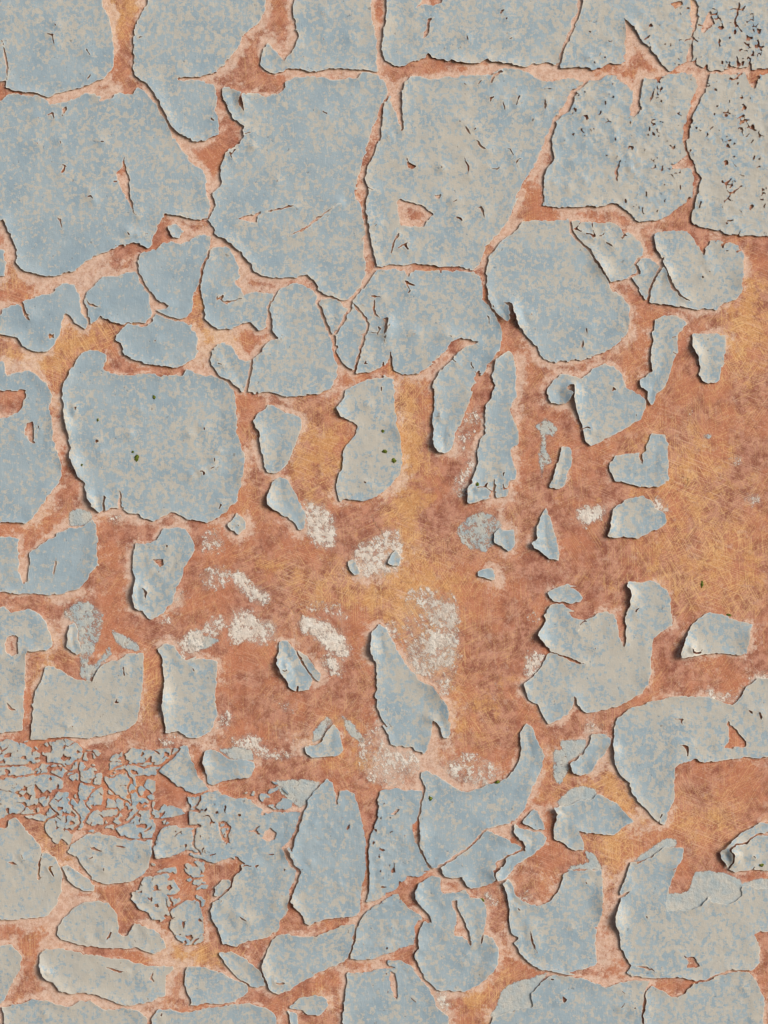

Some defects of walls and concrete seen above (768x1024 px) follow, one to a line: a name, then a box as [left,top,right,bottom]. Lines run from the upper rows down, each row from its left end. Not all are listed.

peeling [0,0,584,300]
peeling [543,0,768,236]
water stain [177,528,276,659]
water stain [300,499,338,549]
water stain [299,601,355,678]
water stain [354,529,404,578]
peeling [0,219,768,1024]
water stain [385,587,461,697]
water stain [217,710,307,760]
water stain [358,719,420,787]
water stain [443,753,505,788]
crack [0,780,490,1024]